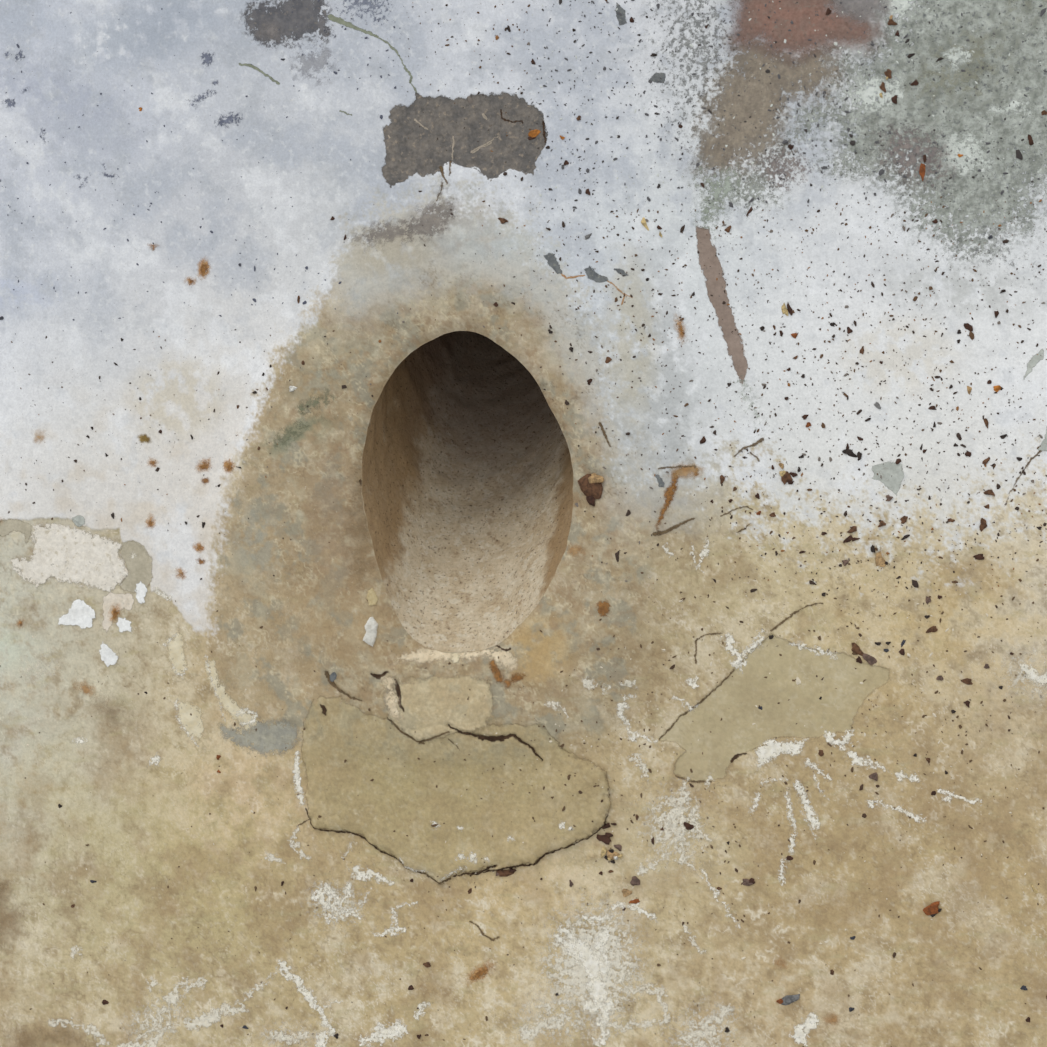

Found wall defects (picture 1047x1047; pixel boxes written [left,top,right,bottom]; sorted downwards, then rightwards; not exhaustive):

spalling [382,92,565,188]
peeling [0,515,171,667]
crack [325,671,362,701]
crack [370,671,543,761]
crack [694,633,722,664]
crack [770,603,823,631]
damp [824,729,920,782]
crack [299,808,608,884]
damp [748,738,833,886]
damp [48,960,343,1047]
damp [359,1002,430,1047]
damp [518,896,736,1047]